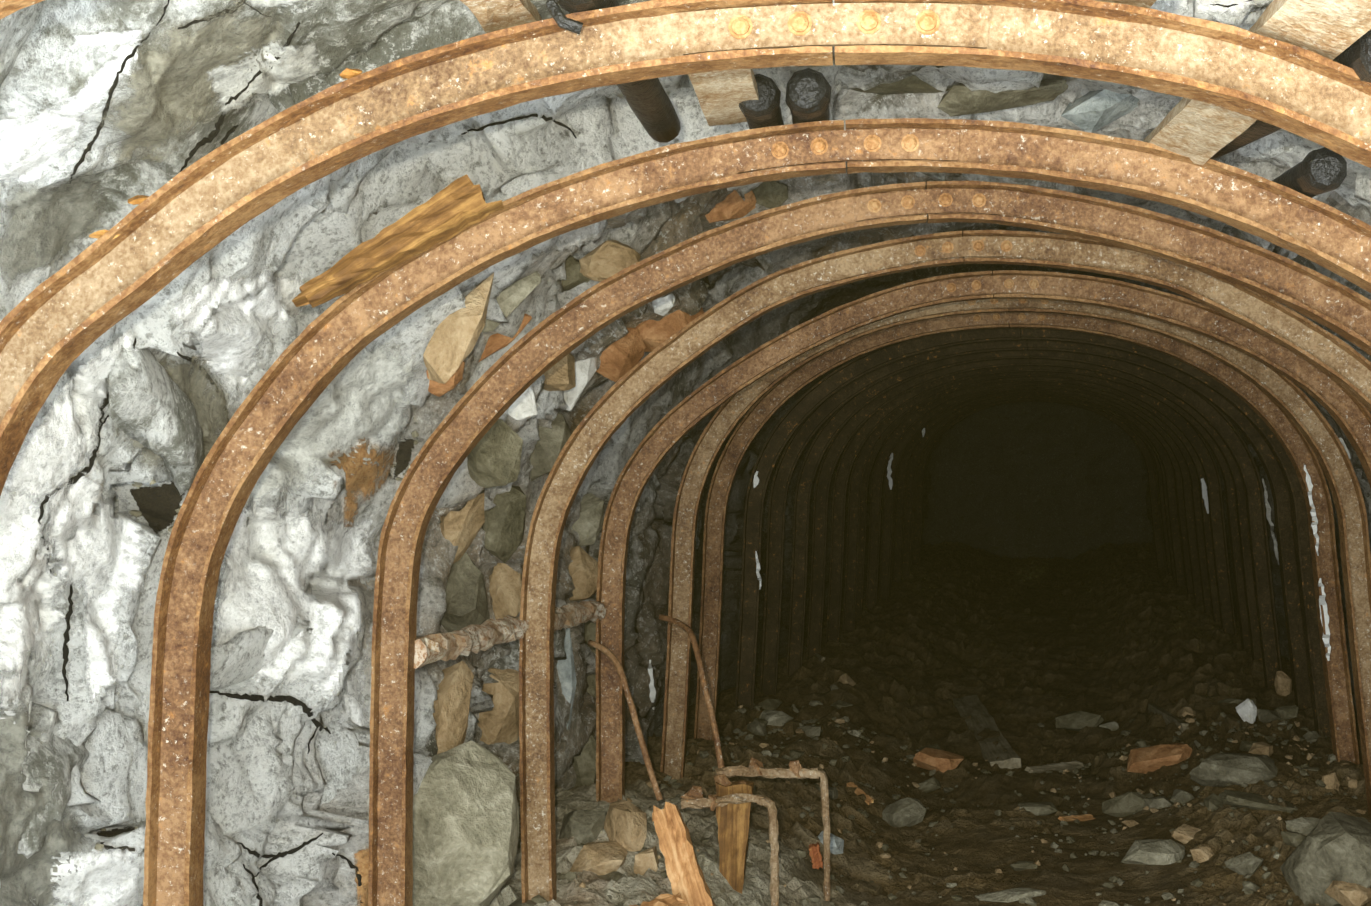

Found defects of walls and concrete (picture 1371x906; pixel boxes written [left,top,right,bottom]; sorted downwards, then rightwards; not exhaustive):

crack [69,0,301,184]
corrosion [329,438,395,527]
crack [38,392,109,701]
crack [210,691,331,754]
crack [237,833,364,906]
corrosion [354,849,369,906]